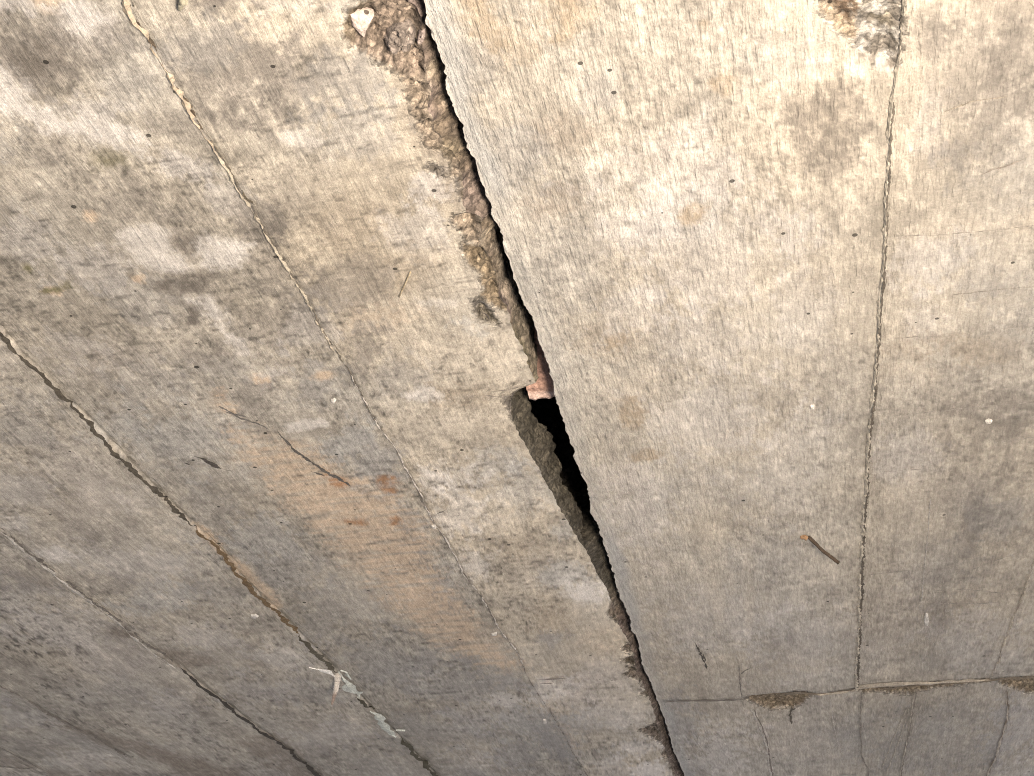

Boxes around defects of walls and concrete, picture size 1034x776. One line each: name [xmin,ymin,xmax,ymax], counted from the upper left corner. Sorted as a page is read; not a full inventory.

crack [130,4,274,246]
crack [895,15,903,65]
crack [0,528,321,776]
crack [0,332,350,673]
crack [290,271,588,776]
crack [667,102,1034,776]